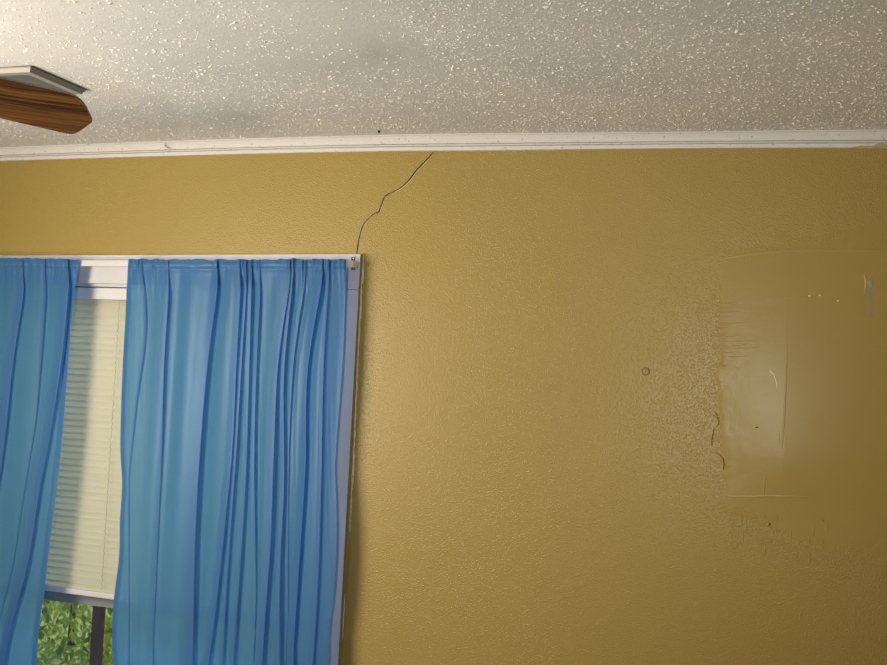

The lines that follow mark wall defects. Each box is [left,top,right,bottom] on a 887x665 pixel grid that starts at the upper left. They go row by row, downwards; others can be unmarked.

crack [349,153,432,532]